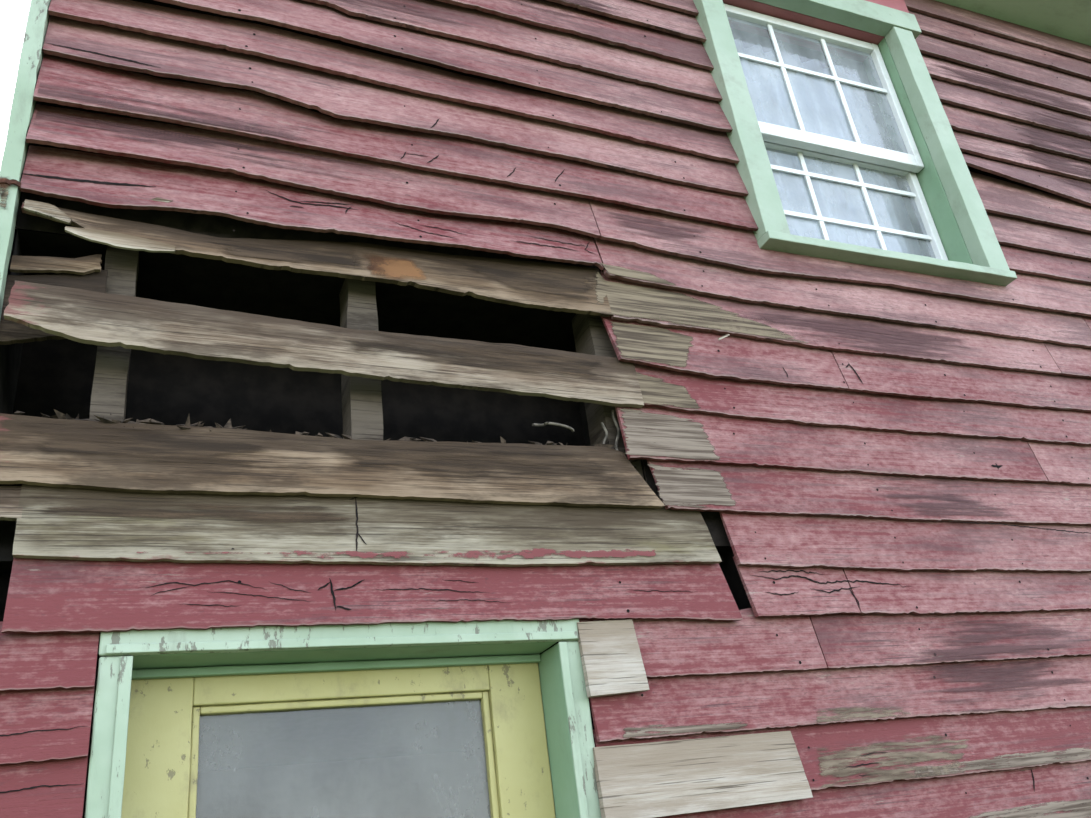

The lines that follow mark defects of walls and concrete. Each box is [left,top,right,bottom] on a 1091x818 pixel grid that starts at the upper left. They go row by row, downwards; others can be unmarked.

spalling [0,199,808,508]
crack [139,497,512,610]
peeling [267,550,409,559]
peeling [425,548,656,559]
spalling [0,575,11,621]
crack [753,570,912,608]
peeling [818,735,1091,788]
peeling [971,799,1091,818]